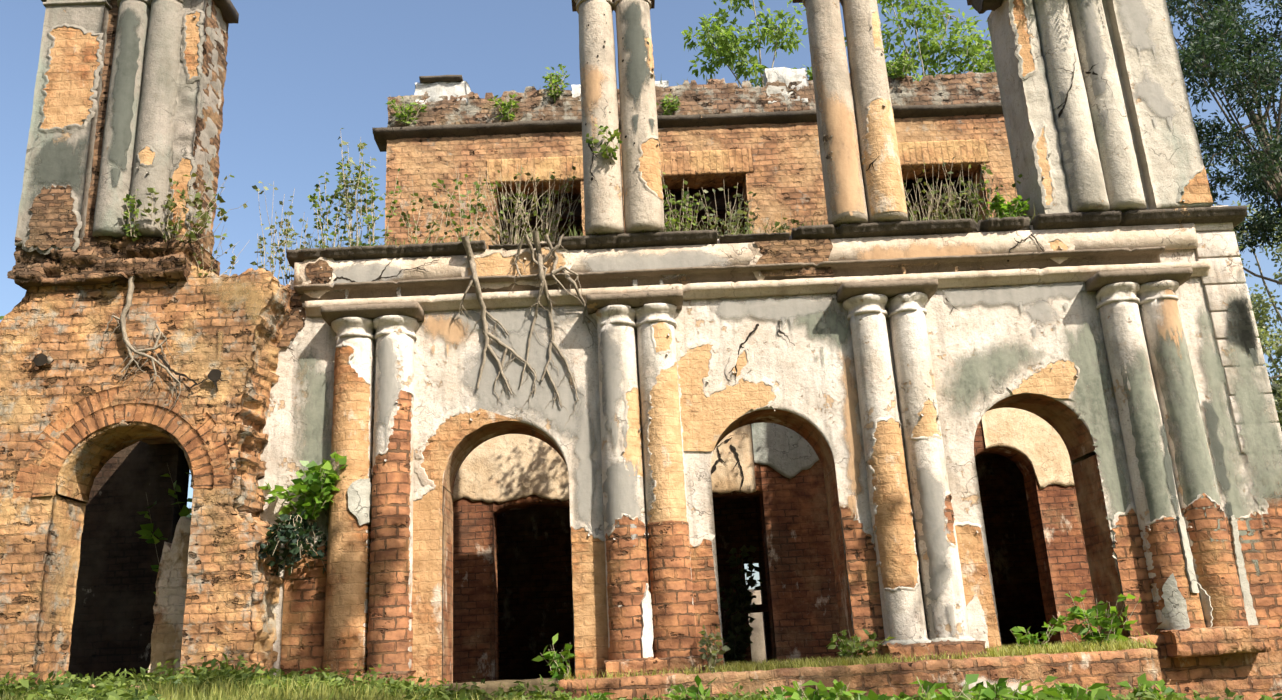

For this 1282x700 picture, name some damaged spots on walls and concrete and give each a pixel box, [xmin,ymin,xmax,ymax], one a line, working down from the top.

peeling [37,23,104,136]
crack [1057,57,1113,117]
peeling [22,183,82,255]
crack [324,260,438,284]
peeling [859,96,907,216]
peeling [1176,165,1213,204]
crack [729,320,795,383]
peeling [1007,352,1080,400]
peeling [280,341,518,685]
peeling [571,321,783,678]
peeling [840,394,942,659]
peeling [1110,472,1282,637]